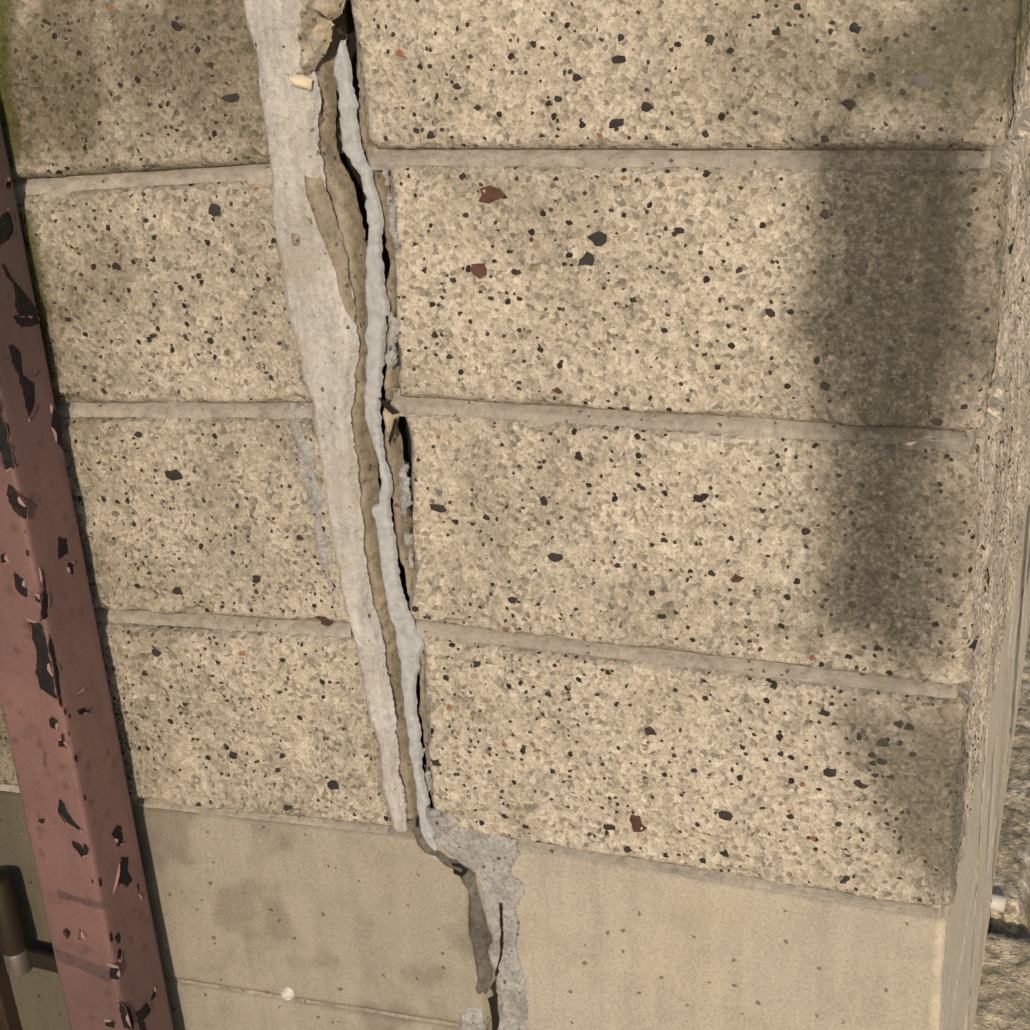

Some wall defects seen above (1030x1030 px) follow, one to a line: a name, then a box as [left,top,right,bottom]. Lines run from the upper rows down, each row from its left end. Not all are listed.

crack [318,0,434,819]
water stain [803,135,960,654]
water stain [1012,506,1030,726]
crack [452,864,468,877]
crack [488,903,503,1030]
water stain [864,725,964,873]